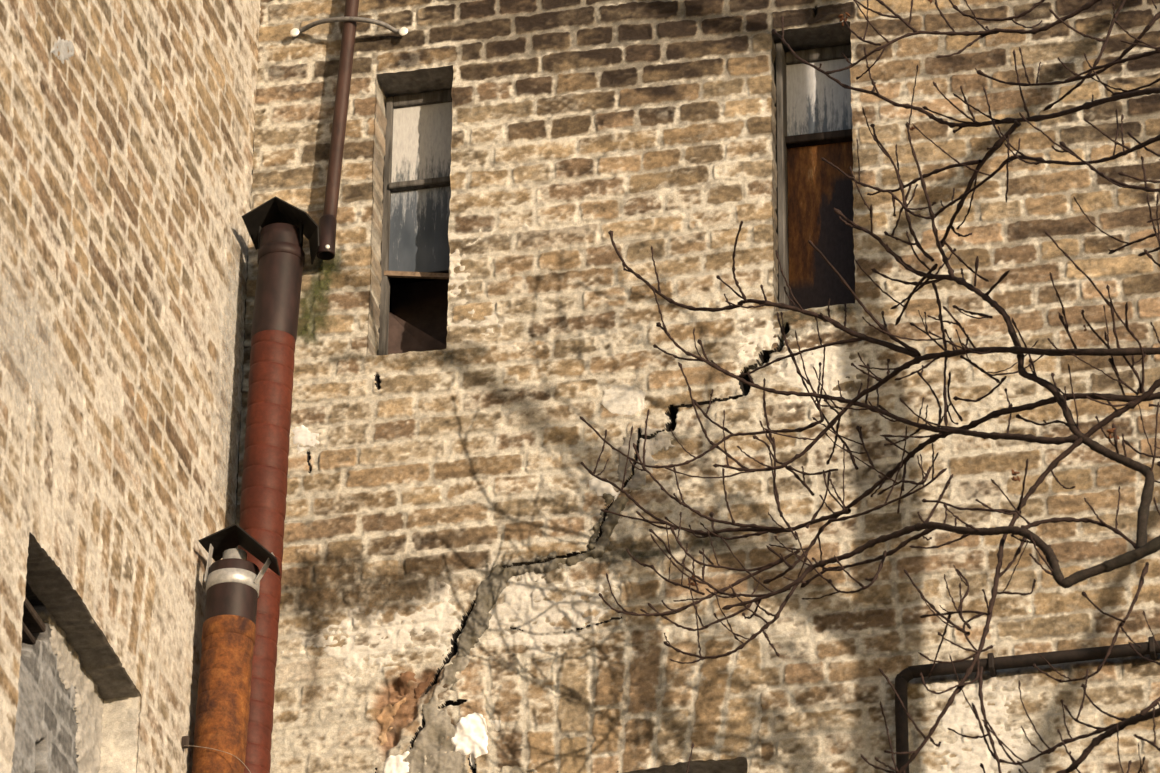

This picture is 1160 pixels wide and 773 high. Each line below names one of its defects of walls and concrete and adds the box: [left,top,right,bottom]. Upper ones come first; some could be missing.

crack [373,375,381,390]
crack [502,322,790,568]
peeling [281,572,463,746]
crack [410,600,475,750]
crack [563,616,622,633]